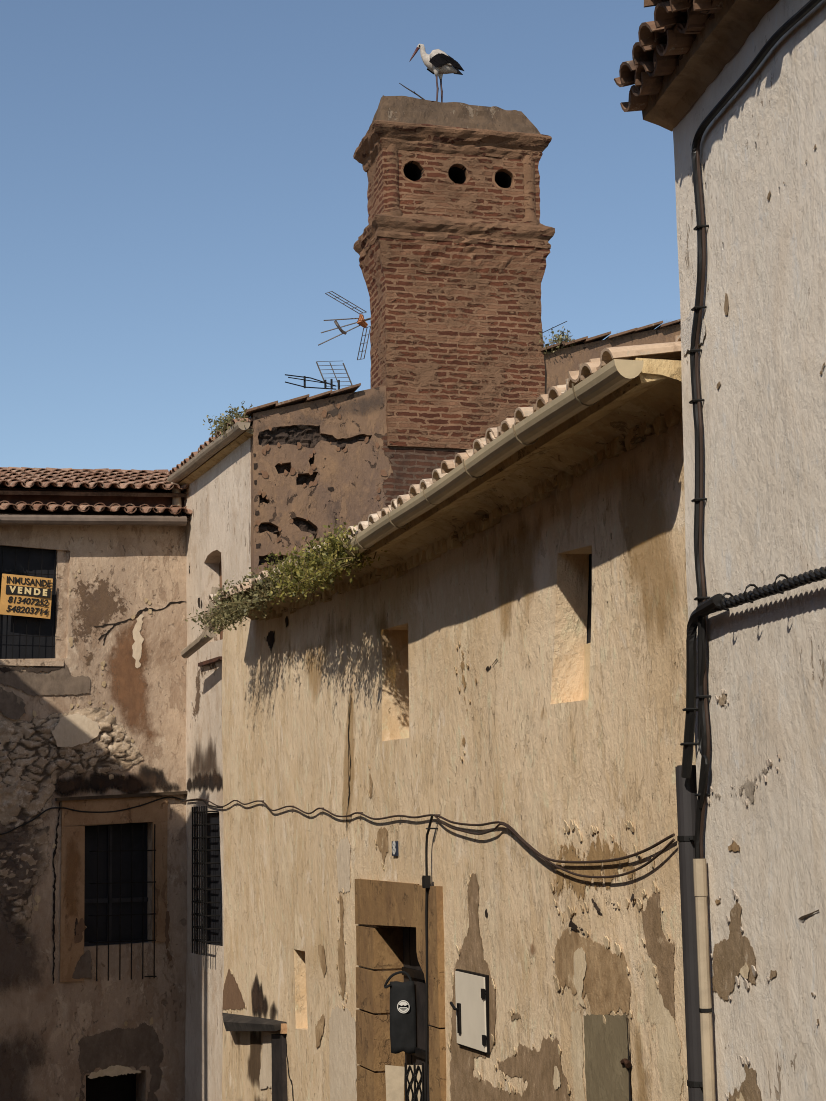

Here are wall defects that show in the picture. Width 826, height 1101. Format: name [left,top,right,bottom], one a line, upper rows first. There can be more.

flaking render [253,404,466,567]
crack [94,601,186,645]
flaking render [0,569,152,943]
water stain [55,741,223,797]
water stain [0,822,39,989]
flaking render [75,1017,164,1101]
peeling [222,969,246,1013]
peeling [448,873,570,1101]
peeling [550,820,675,1024]
peeling [710,889,777,1000]